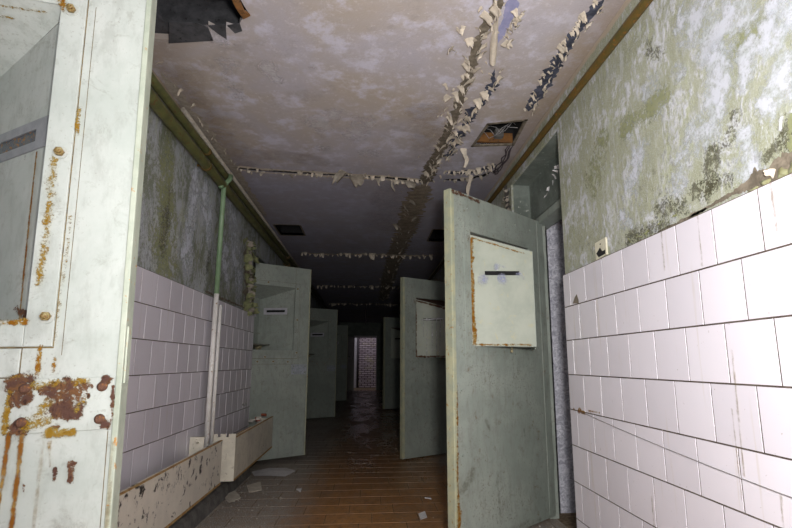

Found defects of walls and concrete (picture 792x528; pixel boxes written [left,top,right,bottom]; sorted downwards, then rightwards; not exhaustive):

corrosion [1,151,37,326]
corrosion [35,156,58,286]
damp [180,160,212,274]
spalling [155,0,250,43]
peeling [235,0,526,307]
peeling [523,0,604,116]
damp [625,109,738,246]
spalling [619,125,792,243]
peeling [672,0,792,195]
damp [760,118,792,163]
corrosion [0,345,115,528]